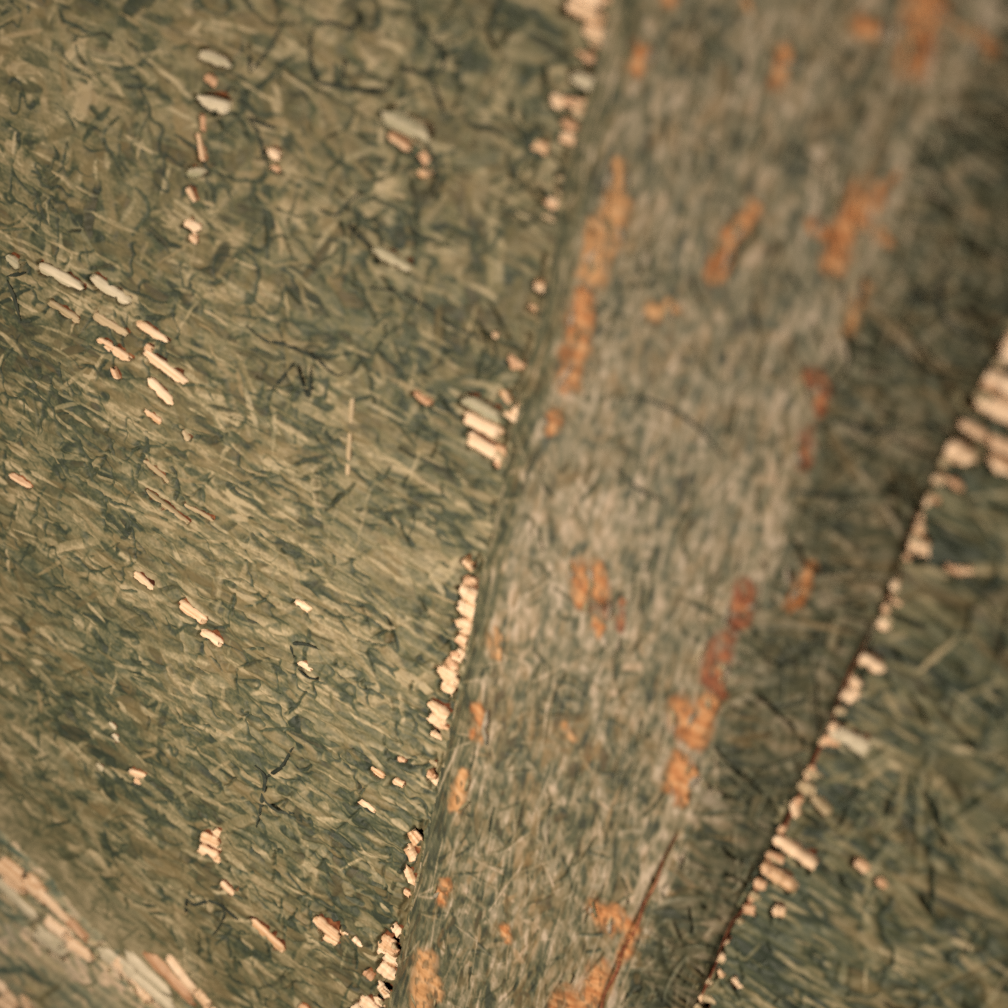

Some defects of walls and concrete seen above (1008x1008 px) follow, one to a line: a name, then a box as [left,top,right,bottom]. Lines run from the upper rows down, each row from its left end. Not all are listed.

crack [308,0,445,116]
peeling [93,310,188,405]
crack [246,325,343,398]
peeling [876,333,1008,631]
crack [290,642,320,680]
peeling [426,554,479,741]
rust [694,578,760,701]
crack [255,748,294,828]
peeling [734,764,833,925]
peeling [0,856,215,1008]
peeling [351,922,404,1008]
crack [600,836,677,1008]